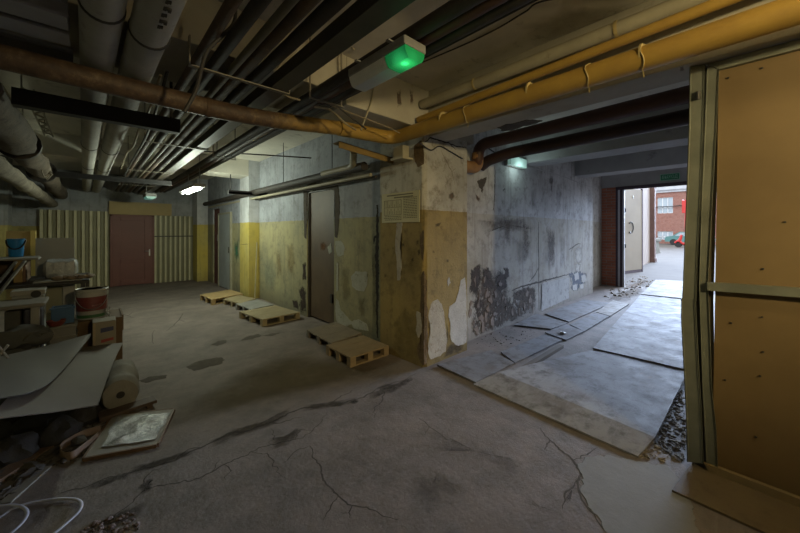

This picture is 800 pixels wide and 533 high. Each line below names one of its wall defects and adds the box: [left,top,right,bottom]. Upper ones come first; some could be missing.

peeling [335,263,369,331]
peeling [416,271,534,366]
crack [60,407,398,520]
crack [540,428,604,530]